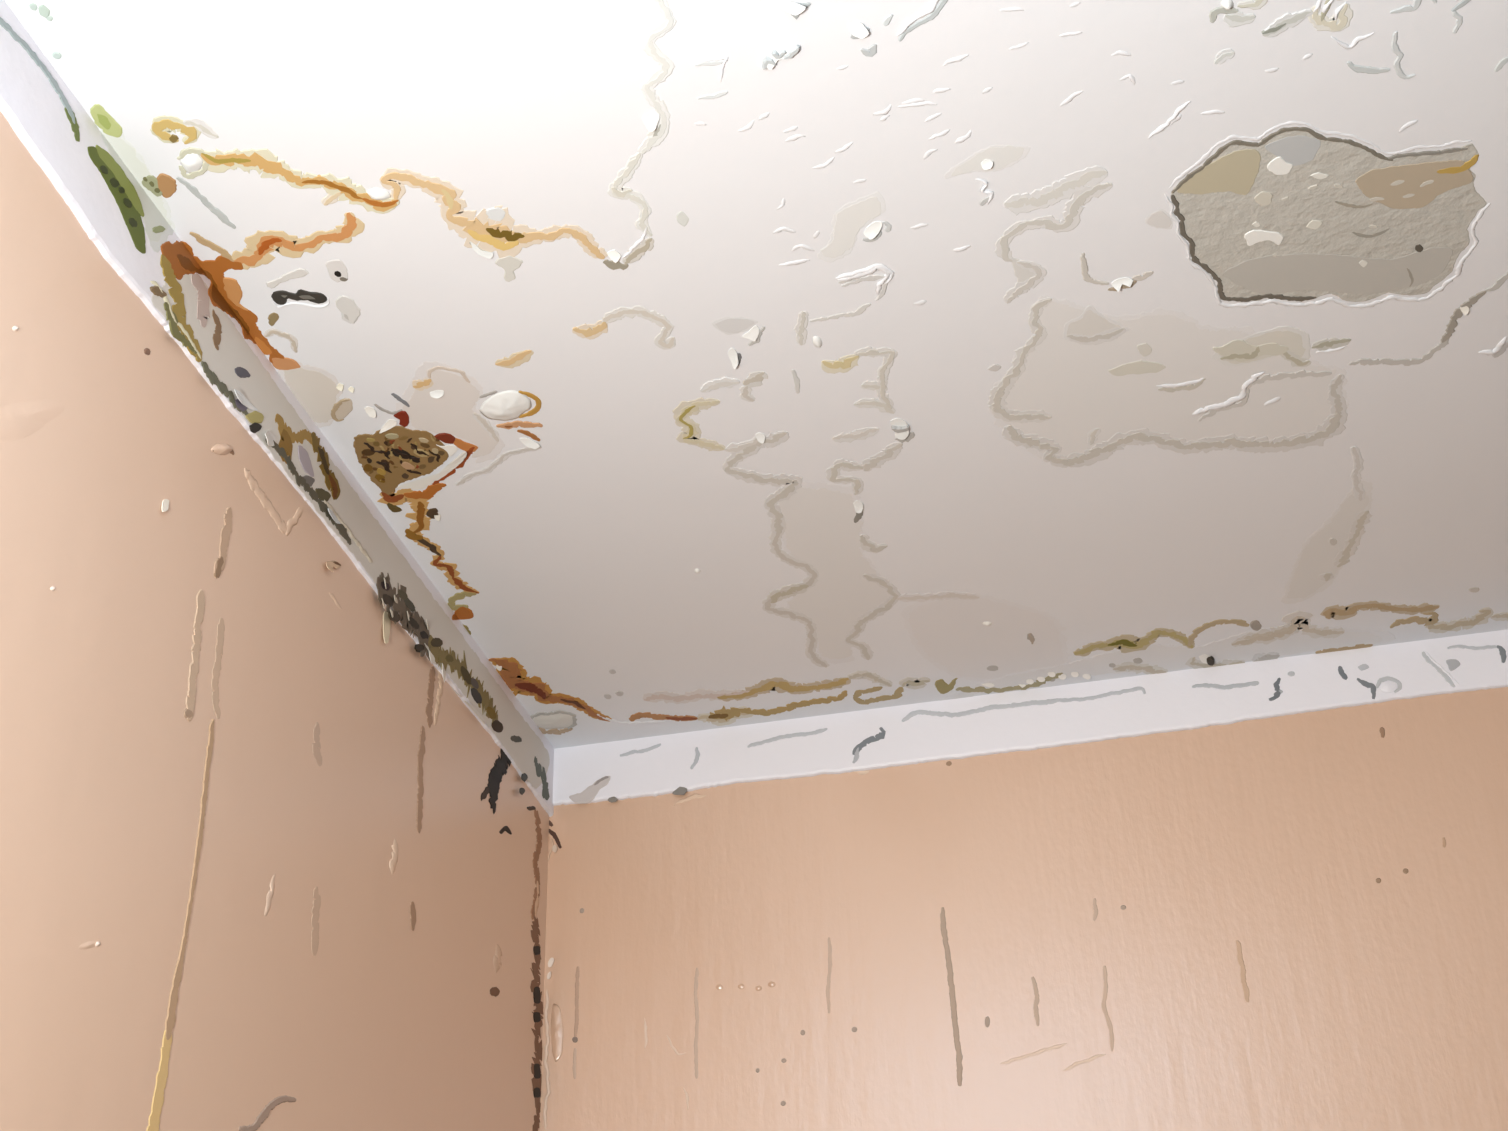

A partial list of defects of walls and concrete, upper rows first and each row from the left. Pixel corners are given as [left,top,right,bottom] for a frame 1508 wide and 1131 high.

peeling [762,44,800,70]
peeling [848,21,877,57]
damp [60,97,175,254]
peeling [1165,121,1491,308]
damp [325,259,361,324]
damp [495,350,534,368]
damp [572,305,676,350]
spalling [353,407,467,495]
damp [672,165,1396,701]
damp [642,689,750,704]
damp [416,666,444,833]
mould [481,749,512,835]